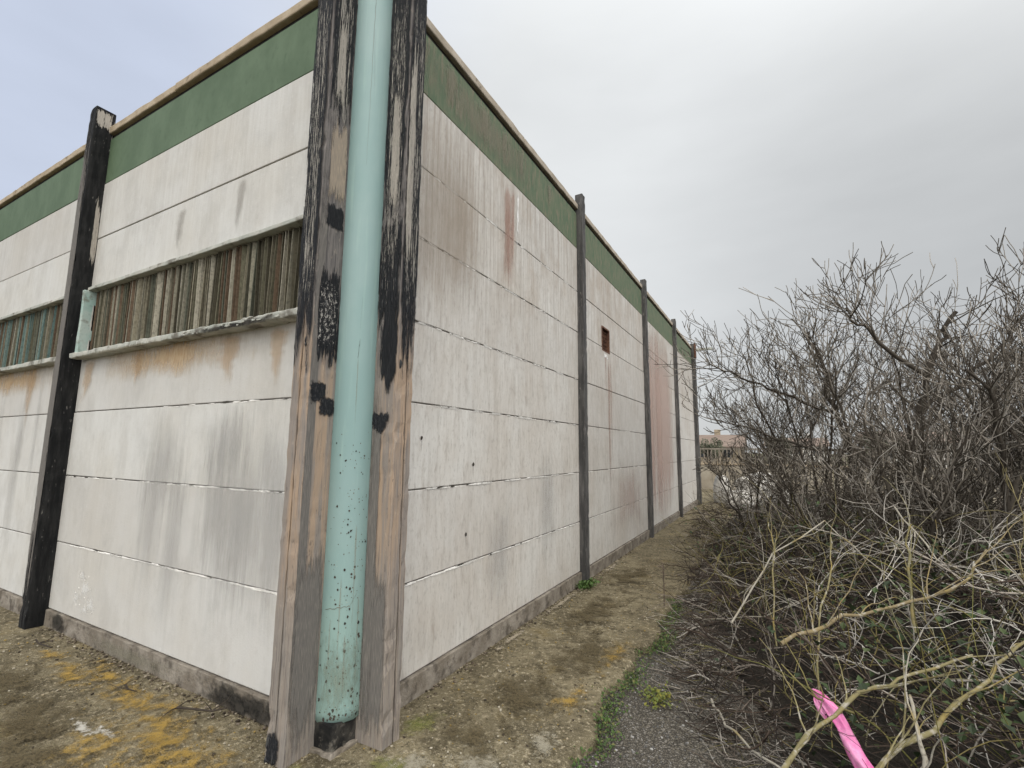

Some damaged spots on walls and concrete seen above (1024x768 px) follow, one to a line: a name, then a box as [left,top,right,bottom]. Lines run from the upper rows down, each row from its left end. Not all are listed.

rust [126,341,202,371]